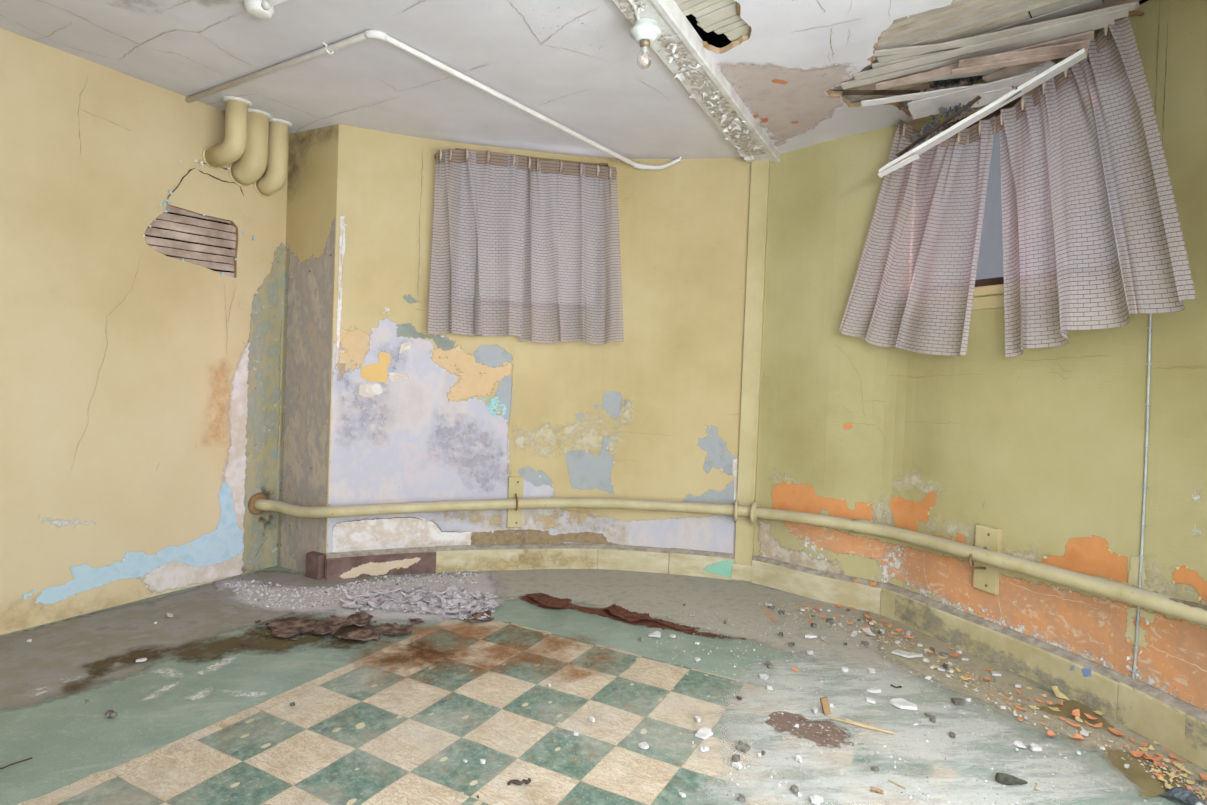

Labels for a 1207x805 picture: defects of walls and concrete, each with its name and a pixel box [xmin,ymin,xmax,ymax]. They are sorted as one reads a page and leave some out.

crack [0,0,499,154]
crack [507,0,605,61]
peeling [658,34,765,160]
spalling [142,189,255,278]
flaking render [0,214,738,710]
peeling [757,473,1207,746]